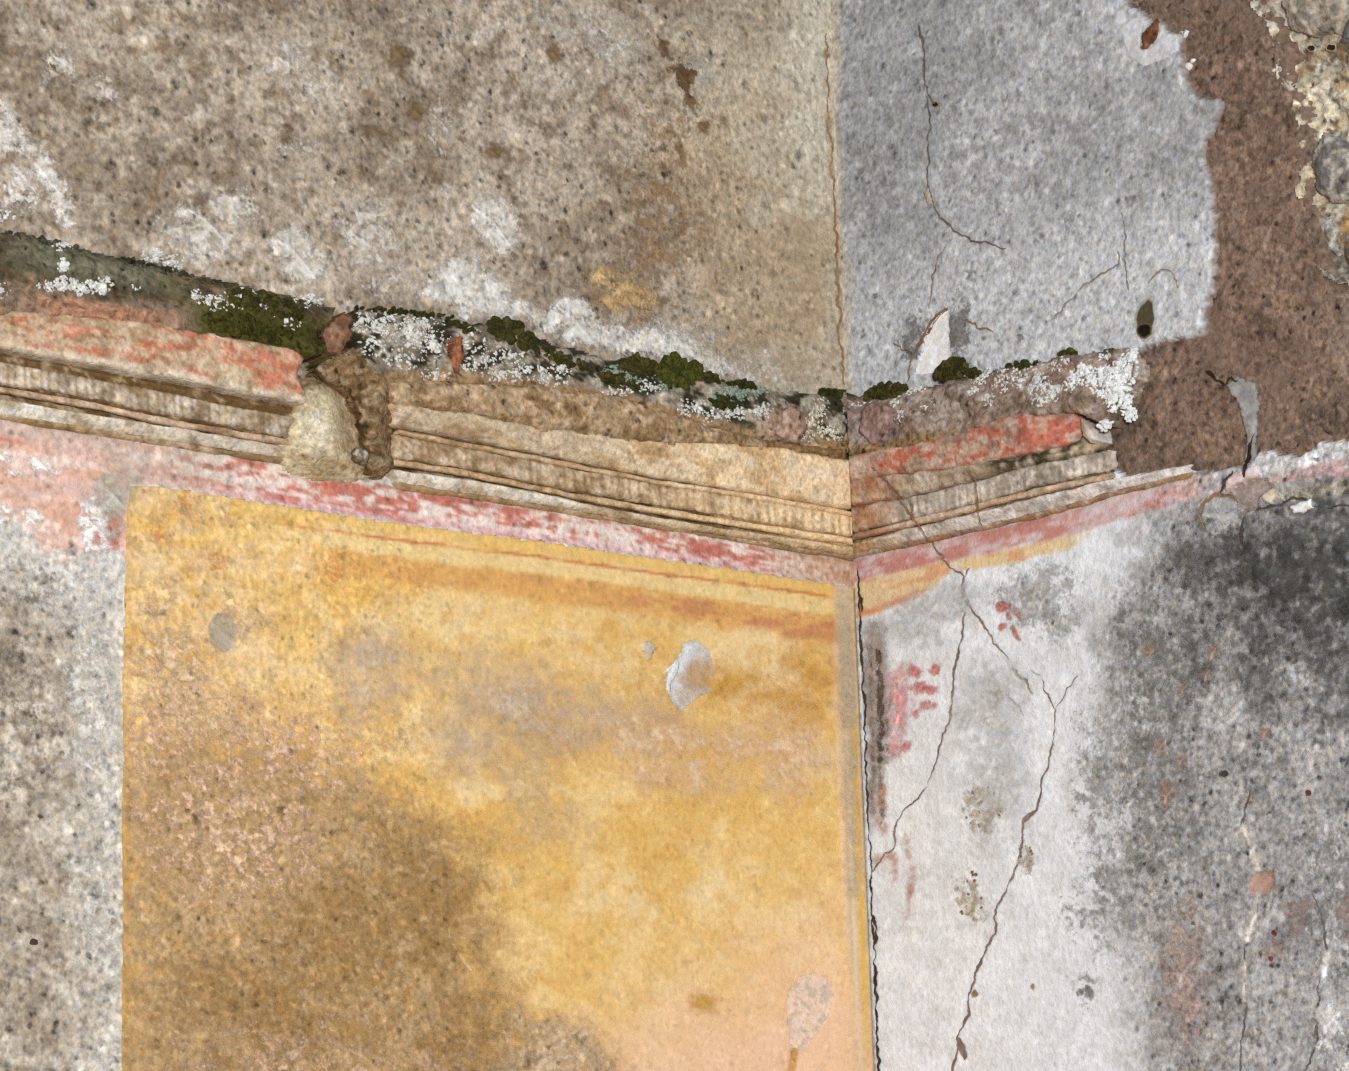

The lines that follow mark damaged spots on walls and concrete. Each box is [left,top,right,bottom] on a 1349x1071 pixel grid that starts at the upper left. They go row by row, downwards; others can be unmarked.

damp [0,99,77,228]
crack [893,25,1006,382]
spalling [1106,0,1349,537]
damp [0,577,616,1071]
flaking render [640,641,657,660]
spalling [664,640,714,711]
crack [857,466,1078,1071]
damp [1061,592,1214,1006]
crack [1239,792,1259,1071]
damp [1171,478,1349,747]
damp [1278,821,1349,1071]
crack [1305,894,1329,1070]